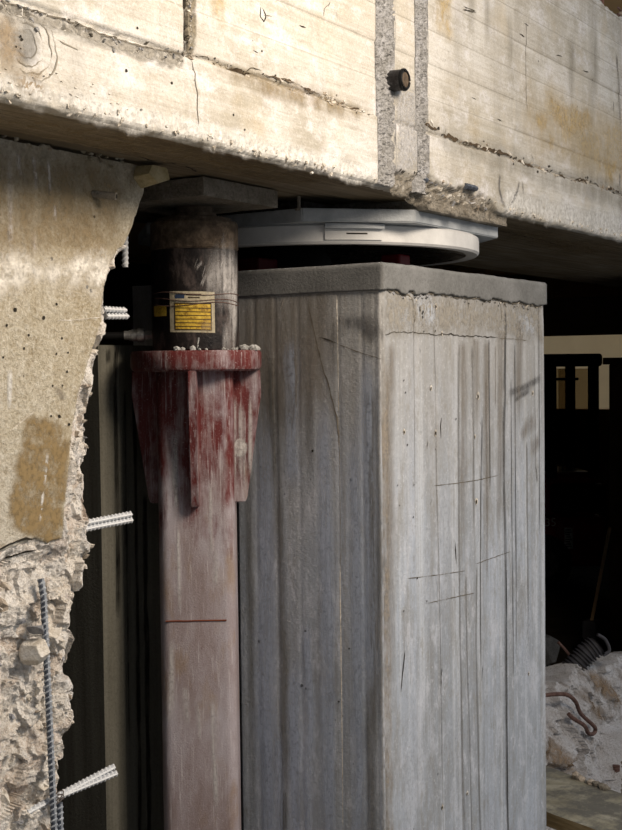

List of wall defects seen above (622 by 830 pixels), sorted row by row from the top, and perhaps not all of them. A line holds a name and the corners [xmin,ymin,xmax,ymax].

crack [178,0,374,121]
crack [425,119,620,194]
spalling [389,168,622,237]
spalling [107,237,129,275]
crack [385,289,542,341]
crack [308,305,381,444]
leakage [11,418,68,543]
crack [0,537,36,562]
spalling [0,301,134,830]
spalling [545,692,598,736]